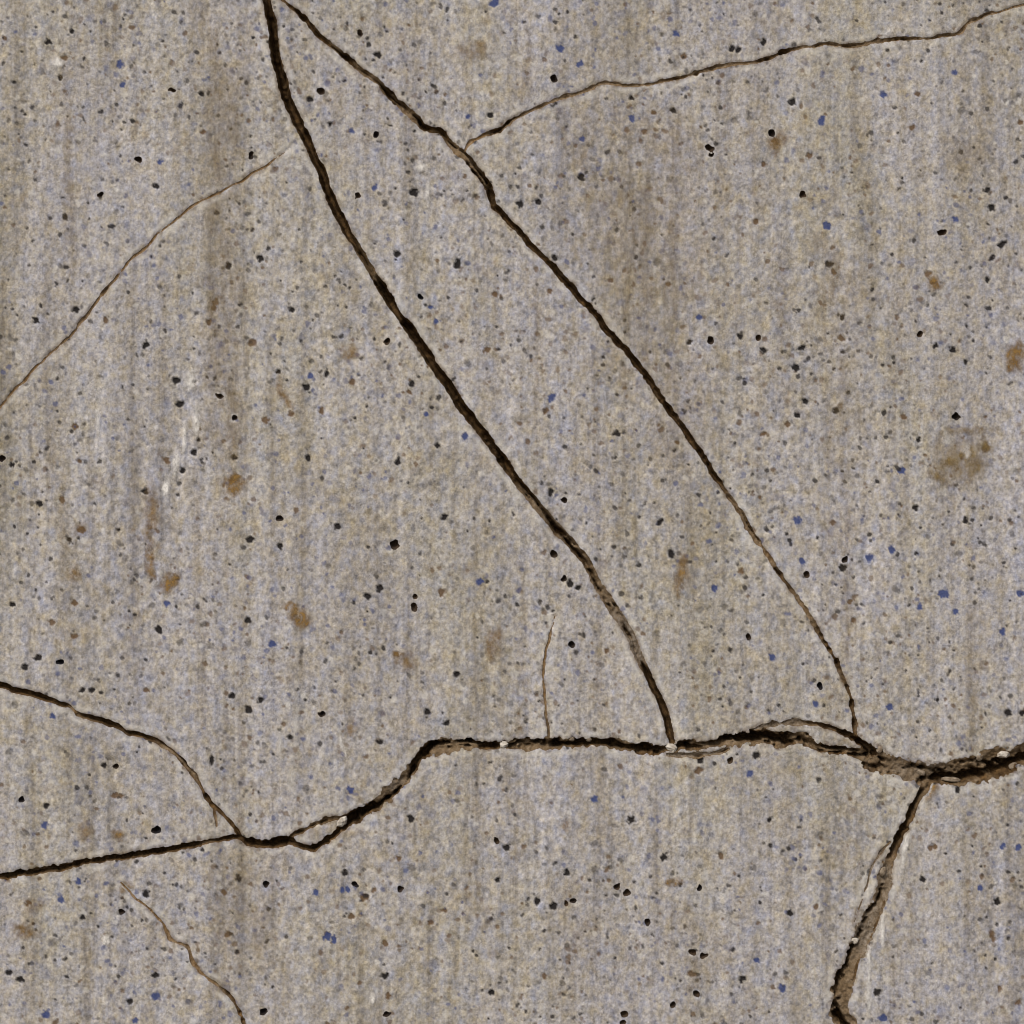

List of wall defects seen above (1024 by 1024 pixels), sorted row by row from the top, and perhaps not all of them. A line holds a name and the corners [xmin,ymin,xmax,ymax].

crack [0,152,285,409]
crack [262,0,1024,744]
crack [0,616,1024,880]
crack [120,882,246,1024]
crack [829,780,932,1024]